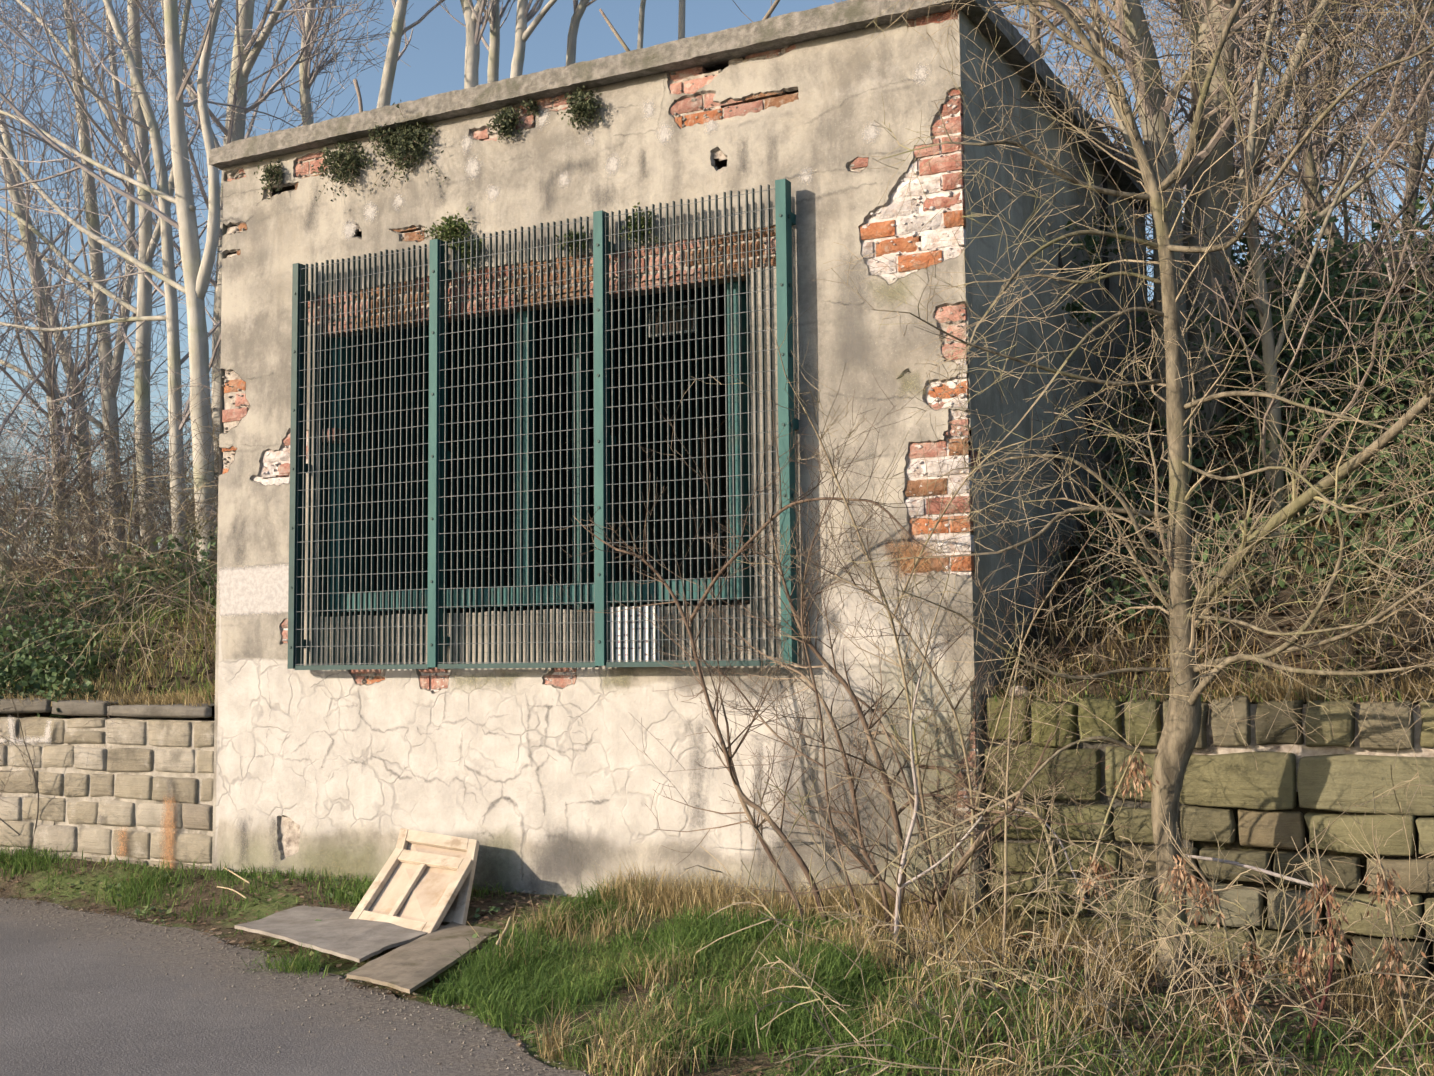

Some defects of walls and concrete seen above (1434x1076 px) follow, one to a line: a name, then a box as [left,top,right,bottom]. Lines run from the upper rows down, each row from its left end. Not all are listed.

spalling [666,45,799,129]
spalling [710,147,727,171]
spalling [858,87,966,285]
spalling [219,368,250,474]
spalling [250,428,345,486]
spalling [901,301,982,577]
spalling [348,669,386,686]
spalling [415,667,451,694]
spalling [542,668,577,689]
rust [161,798,174,869]
spalling [277,815,301,860]